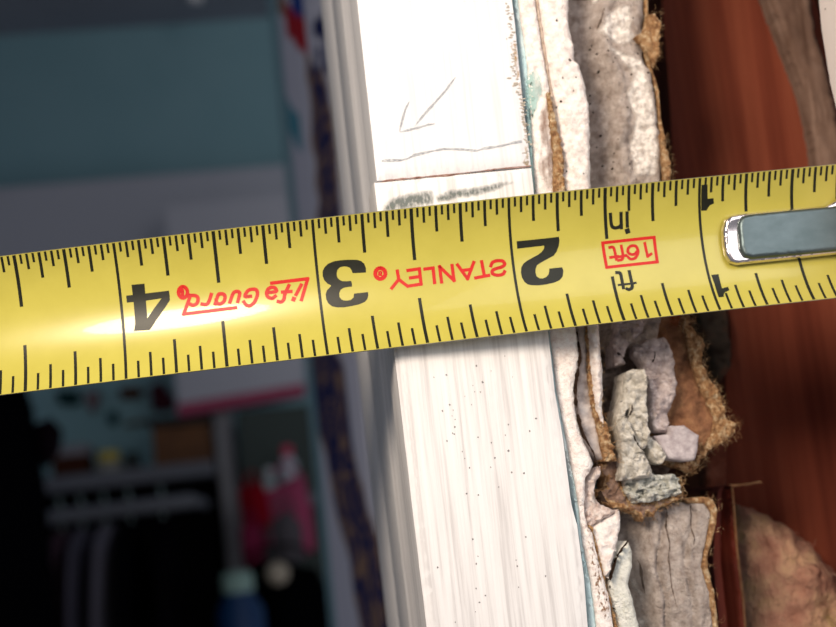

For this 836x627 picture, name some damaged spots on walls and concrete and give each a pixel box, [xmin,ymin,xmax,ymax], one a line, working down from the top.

crack [609,541,645,593]
crack [665,507,677,606]